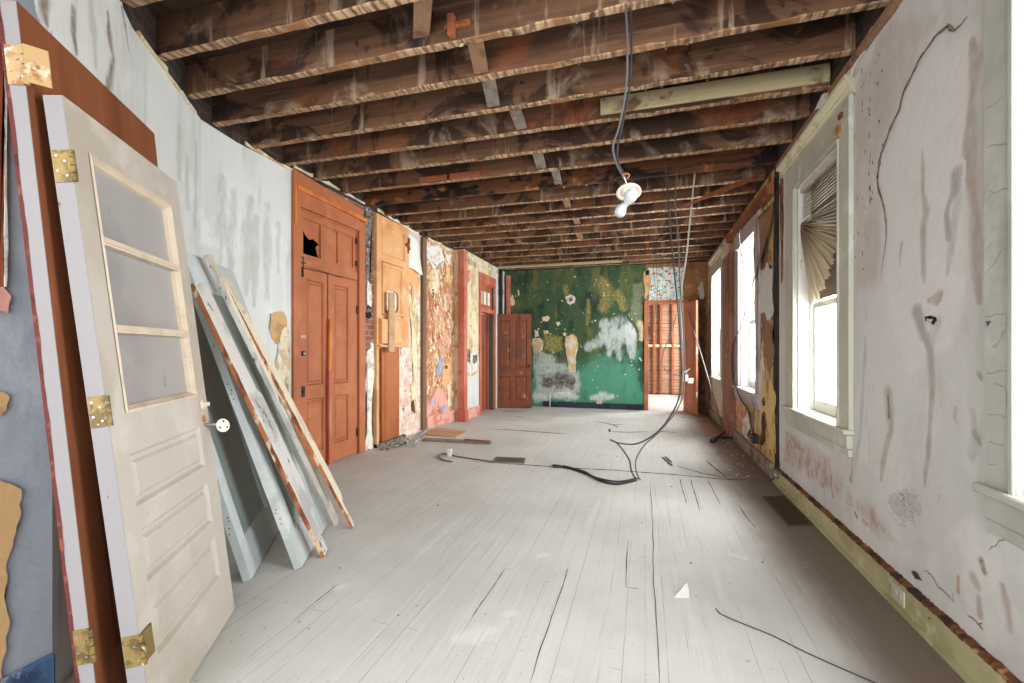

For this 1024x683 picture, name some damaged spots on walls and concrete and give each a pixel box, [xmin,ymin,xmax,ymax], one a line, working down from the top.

peeling [245,141,454,417]
spalling [365,342,375,451]
peeling [532,270,650,375]
peeling [735,178,784,453]
water stain [909,31,984,491]